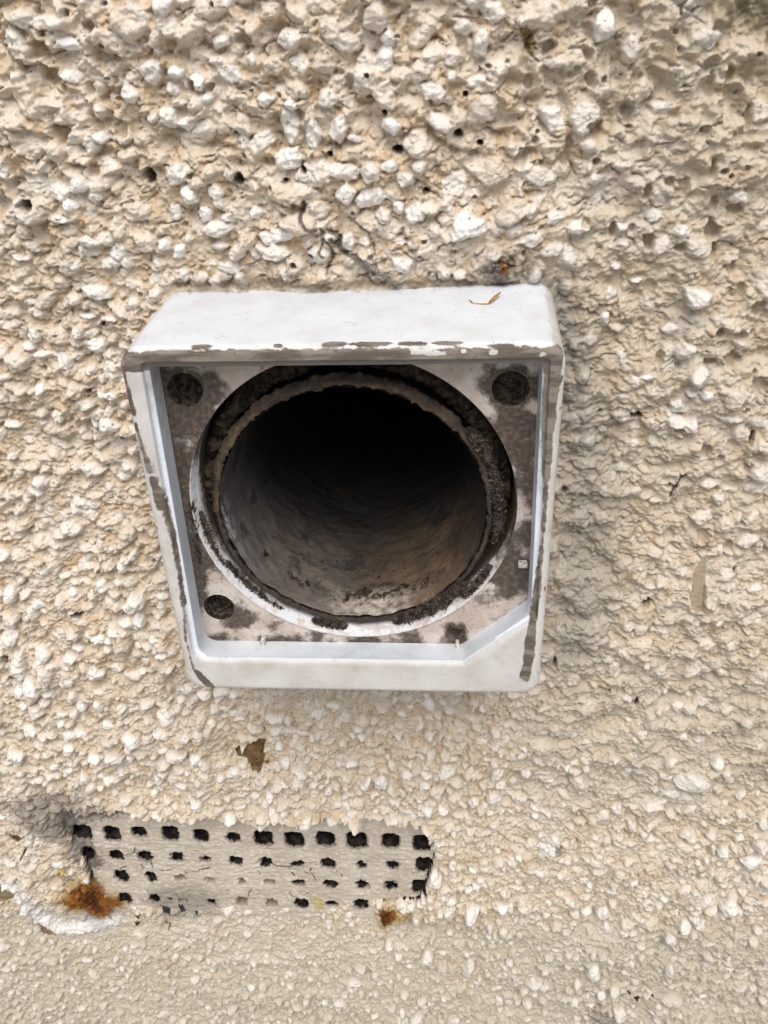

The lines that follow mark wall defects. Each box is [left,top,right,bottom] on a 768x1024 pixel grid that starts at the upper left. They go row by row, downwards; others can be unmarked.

spalling [235,738,269,773]
corrosion [56,878,125,917]
corrosion [378,906,409,930]